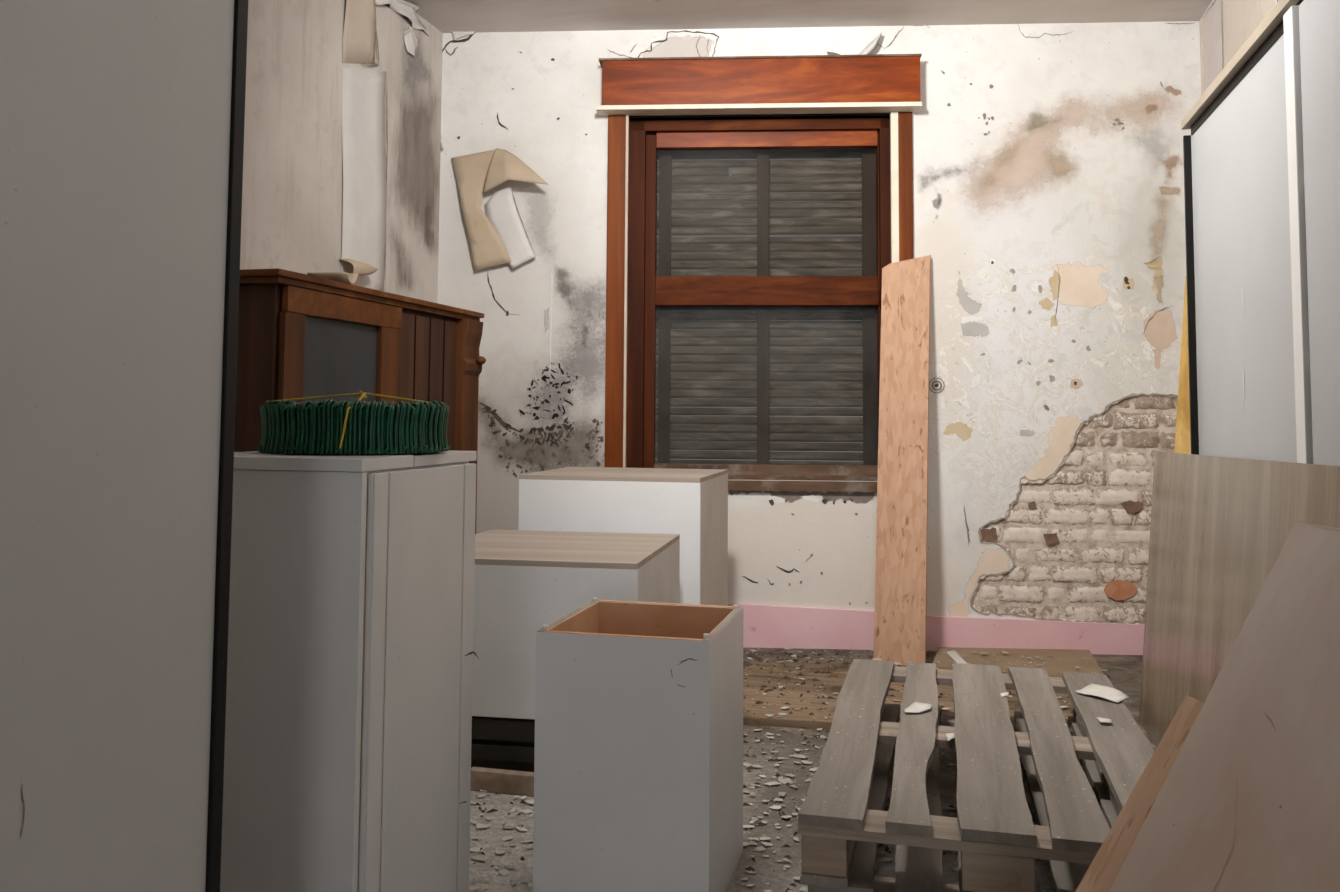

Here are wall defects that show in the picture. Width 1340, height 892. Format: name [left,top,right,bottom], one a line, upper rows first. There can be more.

damp [399,47,437,244]
spalling [957,279,989,336]
flaking render [989,258,1109,327]
spalling [1123,277,1134,289]
flaking render [1144,256,1163,293]
flaking render [1142,306,1178,369]
damp [483,270,606,478]
spalling [1036,359,1083,389]
spalling [729,491,874,506]
flaking render [944,393,1178,624]